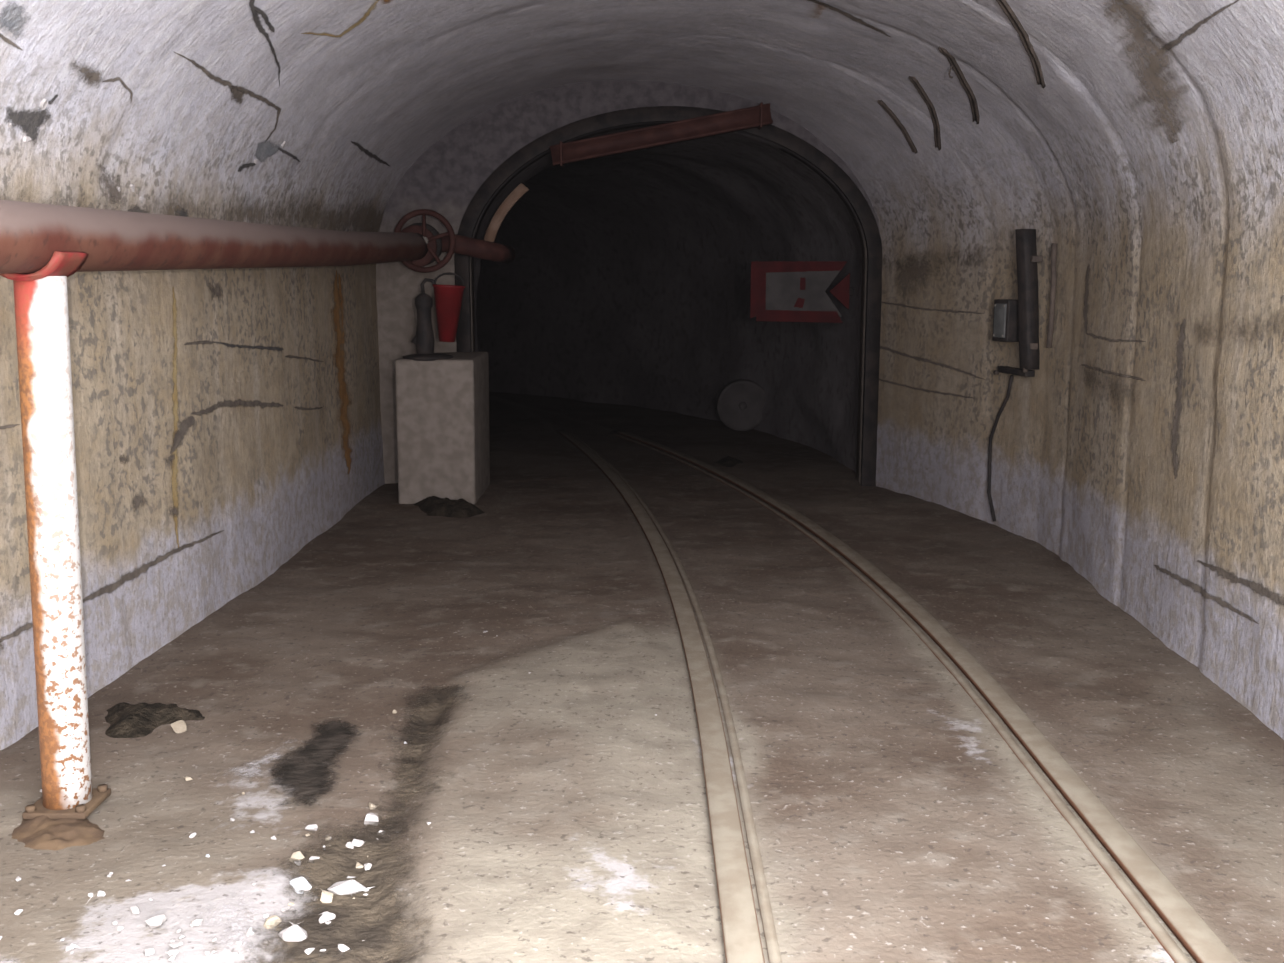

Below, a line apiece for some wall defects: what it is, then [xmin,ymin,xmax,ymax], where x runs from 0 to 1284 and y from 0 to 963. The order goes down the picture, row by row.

crack [0,2,30,51]
crack [173,0,281,141]
spalling [6,94,58,142]
rust [331,270,352,475]
leakage [239,754,281,775]